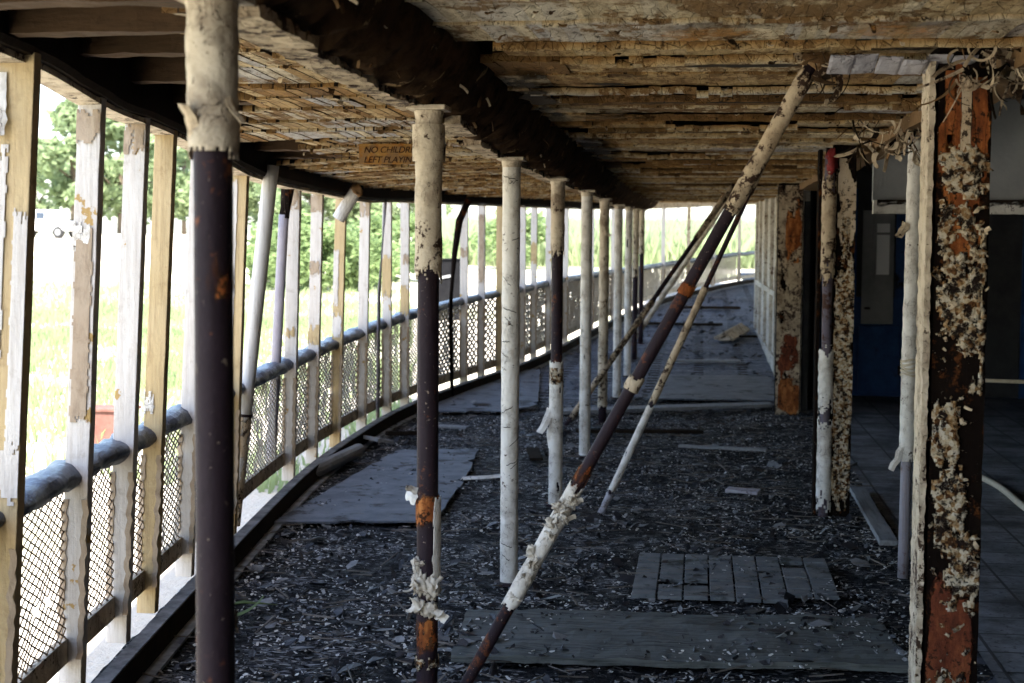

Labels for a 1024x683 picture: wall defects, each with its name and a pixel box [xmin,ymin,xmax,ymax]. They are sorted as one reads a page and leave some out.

peeling [826,40,979,75]
peeling [76,109,100,143]
corrosion [936,64,991,264]
peeling [235,61,910,683]
corrosion [777,326,799,415]
peeling [888,139,994,638]
corrosion [416,494,439,527]
corrosion [416,620,438,654]
corrosion [925,573,972,683]